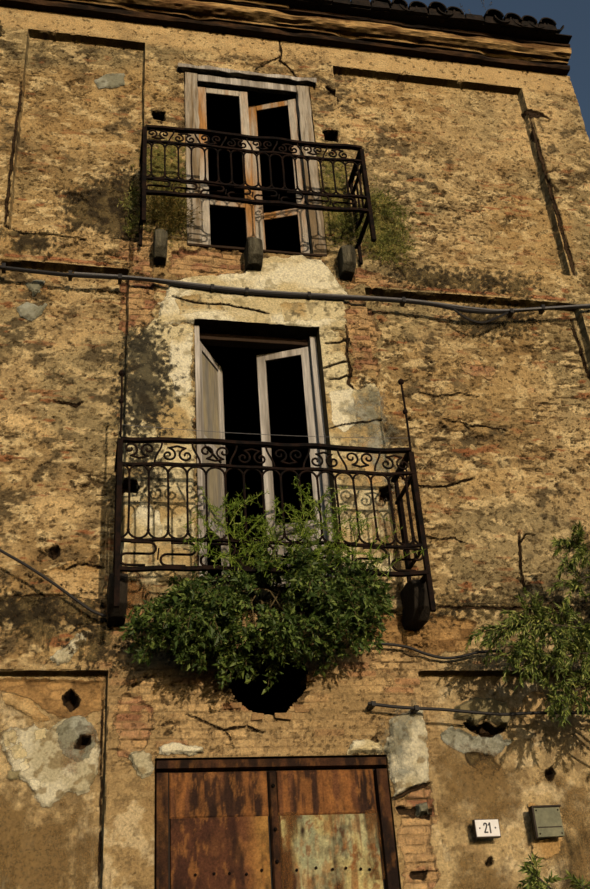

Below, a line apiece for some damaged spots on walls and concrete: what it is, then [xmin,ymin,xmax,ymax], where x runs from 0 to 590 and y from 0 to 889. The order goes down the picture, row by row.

crack [255,41,297,77]
crack [176,297,266,314]
crack [326,328,354,390]
leakage [103,319,194,516]
flaking render [117,230,428,588]
flaking render [50,631,88,665]
flaking render [0,677,203,807]
flaking render [440,721,512,769]
spalling [347,710,441,889]